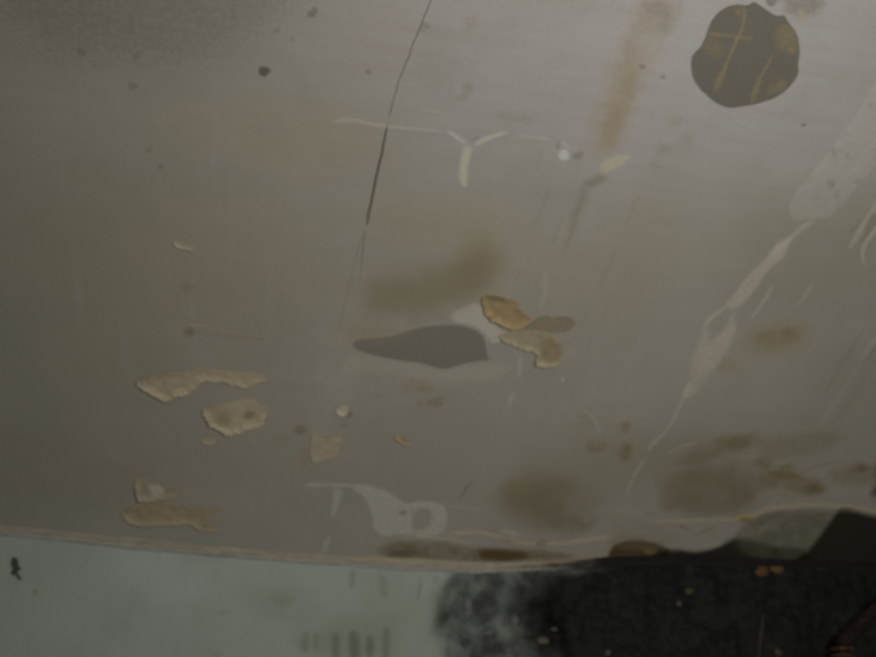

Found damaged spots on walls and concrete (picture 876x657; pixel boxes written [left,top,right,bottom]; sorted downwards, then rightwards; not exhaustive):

flaking render [691,2,799,108]
crack [367,128,387,223]
flaking render [354,295,575,369]
peeling [137,368,268,445]